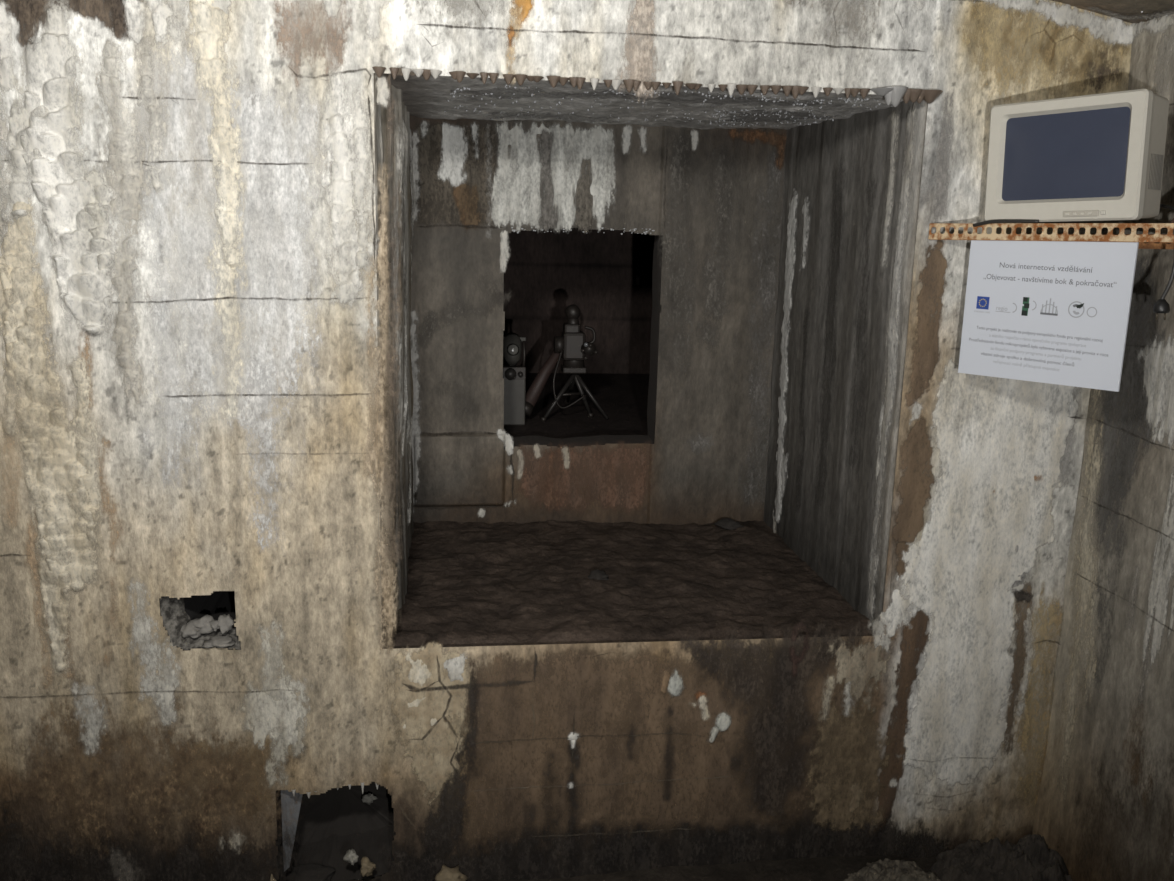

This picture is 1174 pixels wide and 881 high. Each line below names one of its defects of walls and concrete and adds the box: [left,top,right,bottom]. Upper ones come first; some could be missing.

leakage [275,0,345,86]
corrosion [507,0,533,82]
leakage [451,0,838,123]
leakage [963,0,1174,98]
leakage [132,47,321,548]
spalling [892,240,947,579]
leakage [363,94,1174,881]
spalling [160,591,241,650]
leakage [0,582,310,881]
crack [402,647,600,777]
spalling [873,610,929,833]
spalling [276,782,396,881]